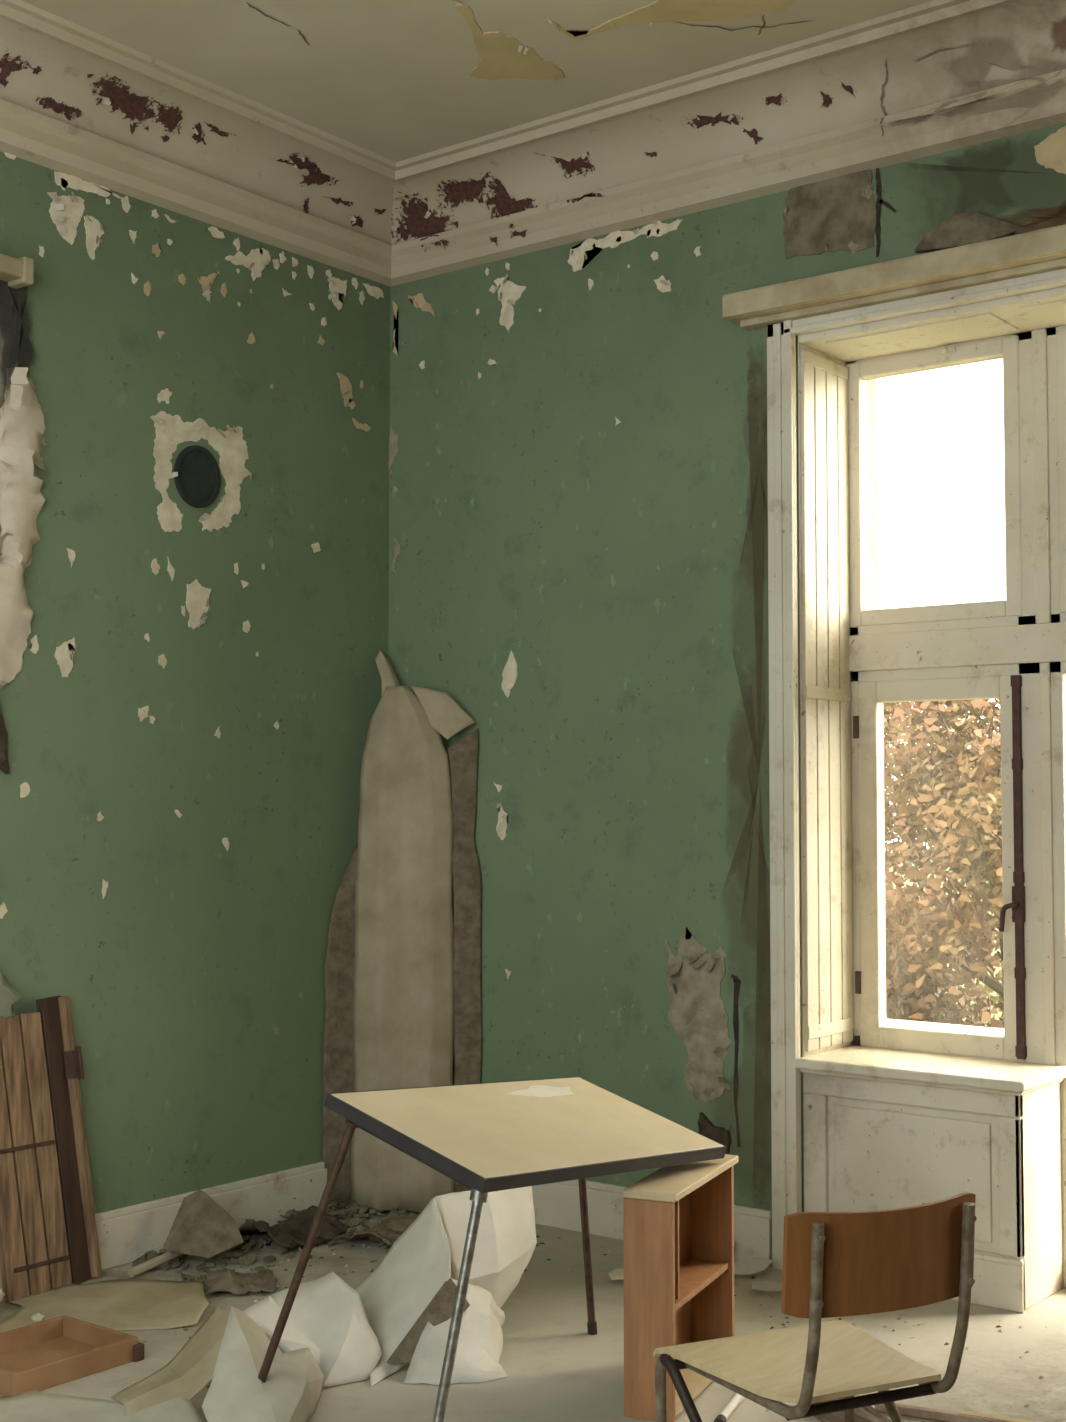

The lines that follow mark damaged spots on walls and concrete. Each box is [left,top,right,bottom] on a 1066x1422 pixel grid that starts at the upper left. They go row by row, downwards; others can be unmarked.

peeling [0,53,42,88]
peeling [36,73,234,145]
peeling [687,112,763,145]
peeling [1034,126,1066,174]
peeling [47,171,131,260]
peeling [274,153,537,251]
peeling [178,226,435,358]
peeling [485,262,526,333]
peeling [568,219,683,293]
peeling [150,388,252,532]
peeling [151,557,212,630]
peeling [30,635,76,677]